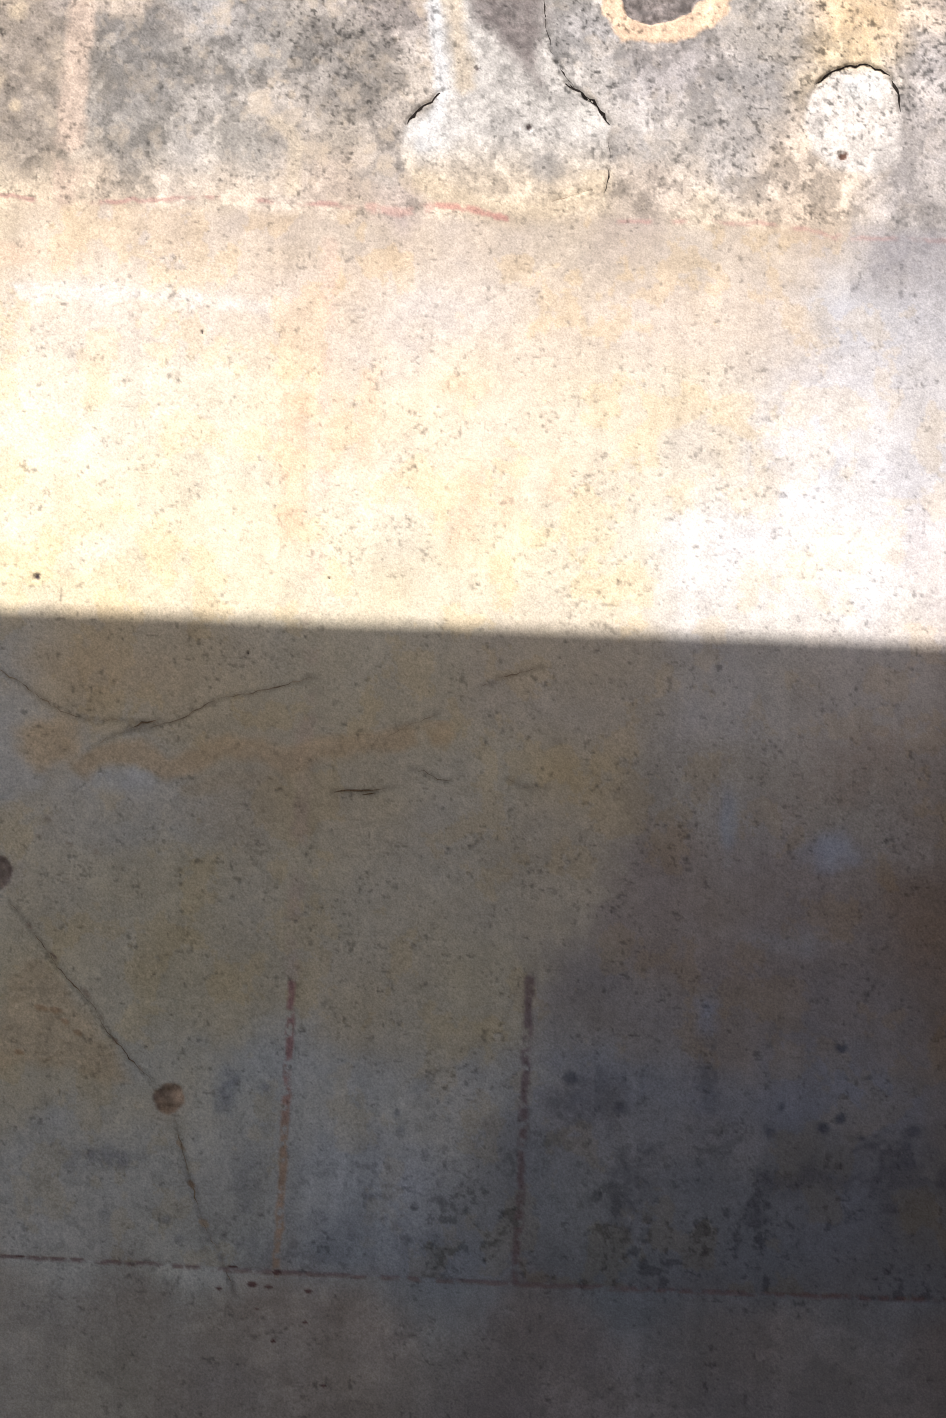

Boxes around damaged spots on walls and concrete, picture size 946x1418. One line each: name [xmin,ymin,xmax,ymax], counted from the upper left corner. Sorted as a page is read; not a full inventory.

water stain [48,0,229,212]
water stain [199,97,307,201]
crack [544,3,611,201]
crack [817,63,901,112]
crack [1,670,312,744]
crack [13,906,150,1078]
crack [174,1118,234,1291]
peeling [226,1264,284,1291]